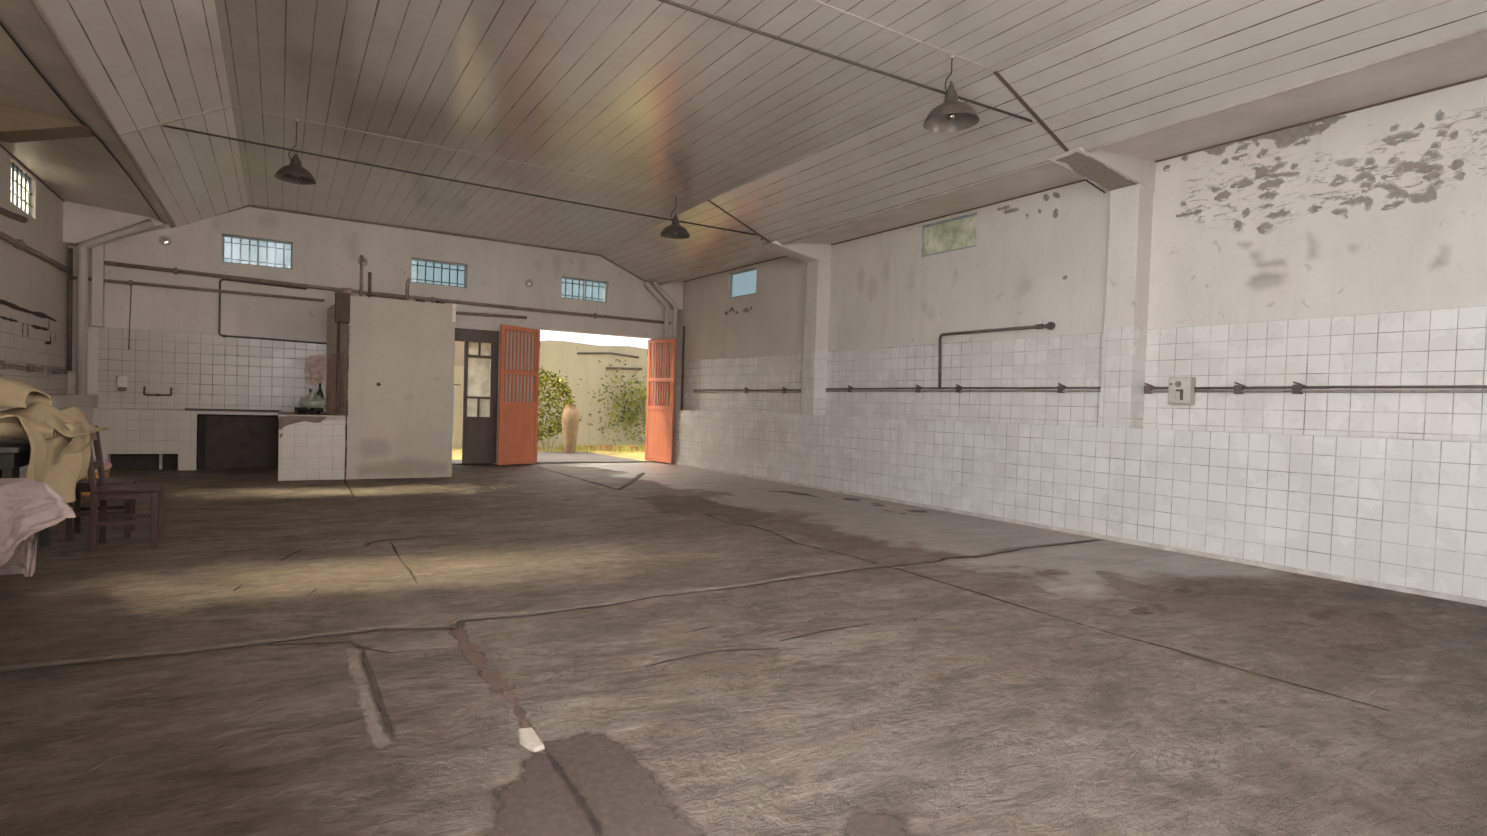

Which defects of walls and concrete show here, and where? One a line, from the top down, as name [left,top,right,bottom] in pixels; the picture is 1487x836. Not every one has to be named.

peeling [1176,110,1464,234]
crack [0,513,1390,711]
damp [484,732,702,836]
damp [844,810,912,836]